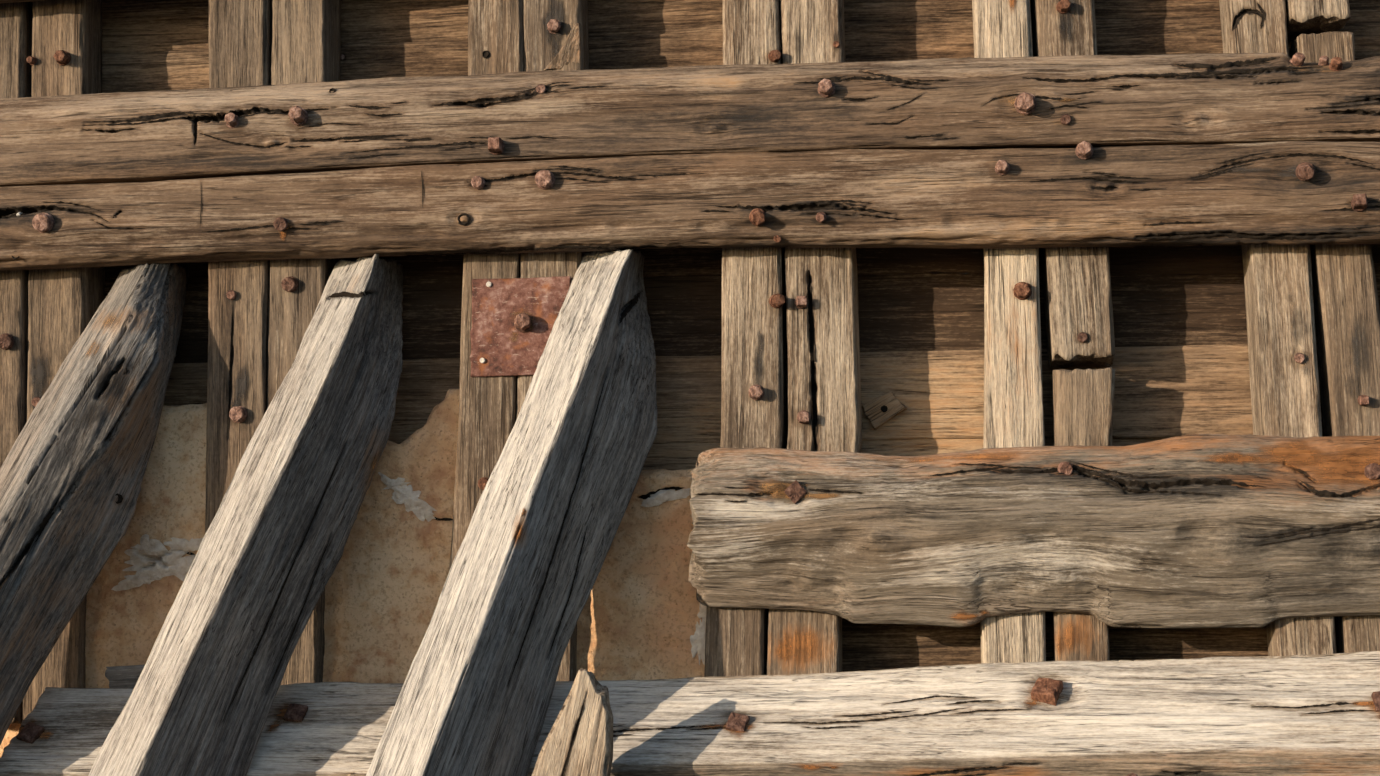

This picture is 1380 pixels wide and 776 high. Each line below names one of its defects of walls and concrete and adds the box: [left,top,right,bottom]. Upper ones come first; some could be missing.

crack [82,81,703,207]
crack [981,3,1380,246]
crack [701,200,917,220]
rust [1206,442,1380,484]
spalling [378,472,437,522]
crack [930,461,1380,546]
spalling [111,534,203,591]
crack [1163,768,1201,776]